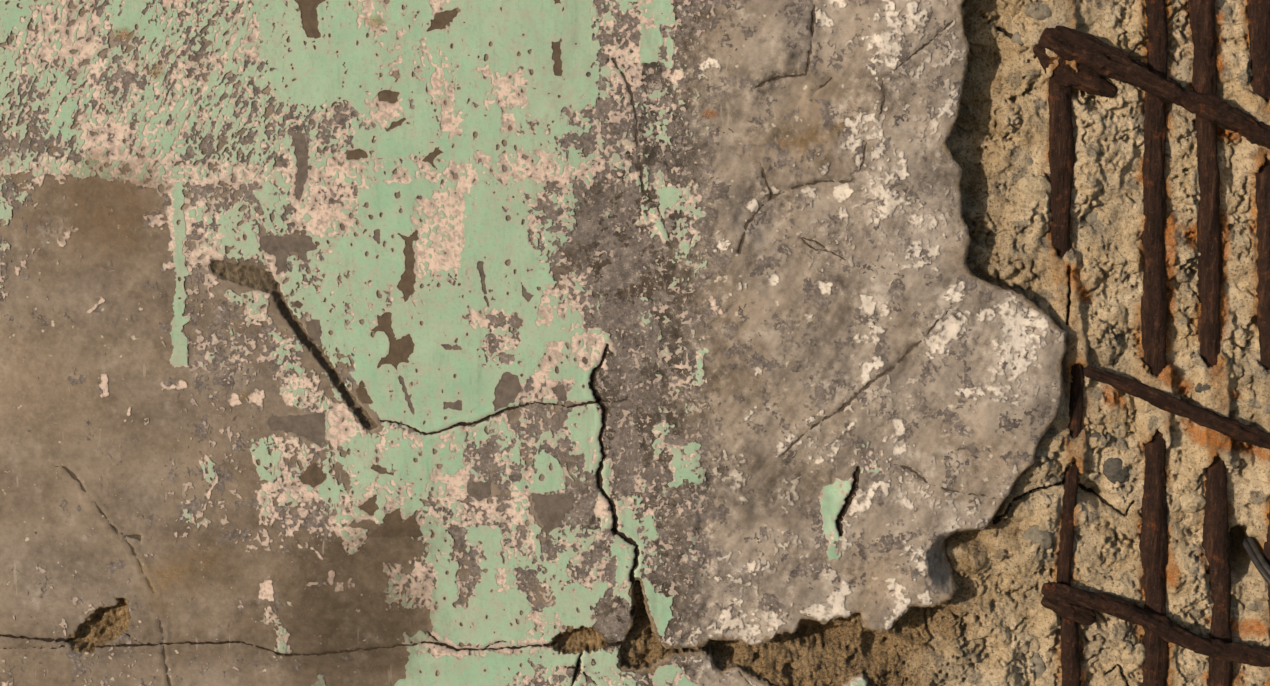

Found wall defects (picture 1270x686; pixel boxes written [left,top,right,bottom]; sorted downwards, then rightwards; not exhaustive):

peeling [804,0,966,142]
crack [737,142,867,254]
spalling [1033,0,1270,376]
rust [1158,214,1197,393]
spalling [31,559,301,686]
crack [0,344,640,686]
crack [836,466,860,536]
crack [782,310,949,455]
crack [894,464,1135,525]
spalling [1041,429,1270,686]
spalling [1068,363,1270,449]
rust [1181,420,1270,459]